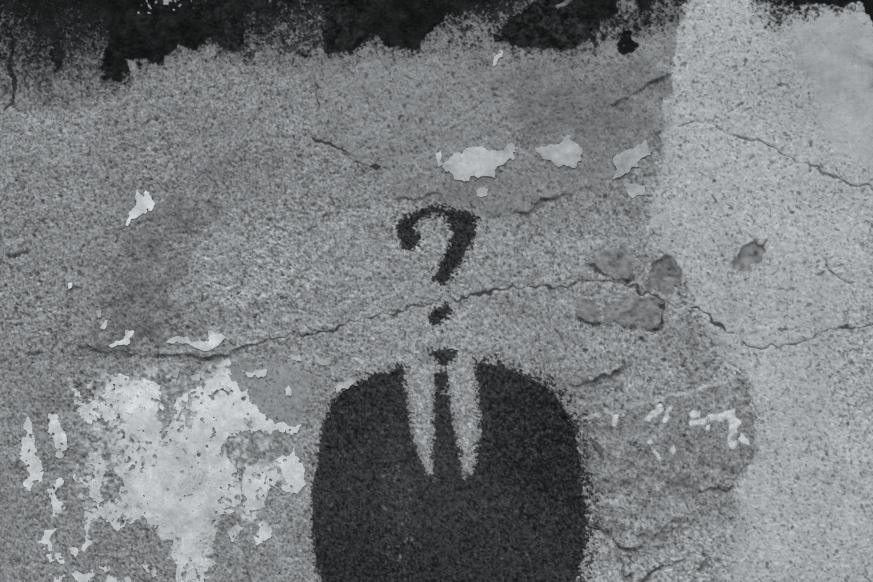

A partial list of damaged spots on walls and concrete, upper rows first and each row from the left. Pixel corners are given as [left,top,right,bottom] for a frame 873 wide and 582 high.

peeling [436,143,518,197]
peeling [535,135,583,168]
peeling [613,139,652,198]
peeling [126,189,155,226]
spalling [732,239,767,271]
crack [261,325,343,343]
crack [454,280,607,302]
crack [628,284,665,323]
spalling [647,256,681,294]
crack [693,307,725,330]
spalling [579,368,623,386]
peeling [20,330,306,582]